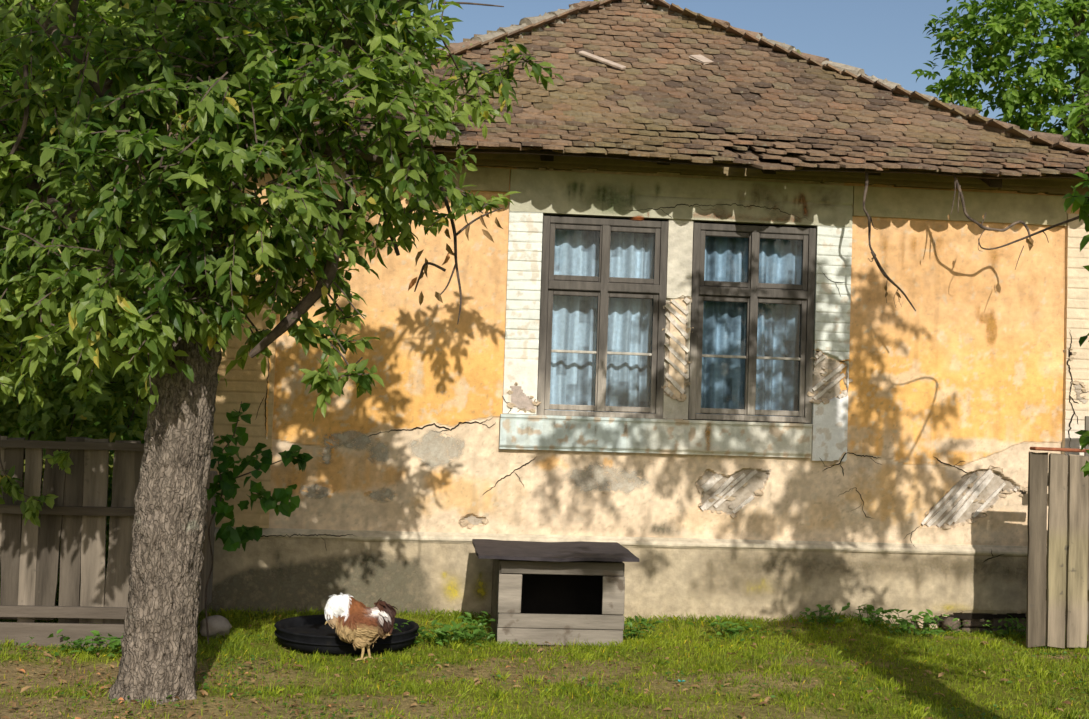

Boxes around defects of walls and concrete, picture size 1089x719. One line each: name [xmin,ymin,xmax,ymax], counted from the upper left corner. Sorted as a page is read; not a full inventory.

crack [623,203,813,223]
flaking render [662,295,694,402]
crack [354,396,511,442]
flaking render [506,382,541,413]
flaking render [807,351,853,404]
crack [482,455,537,496]
flaking render [696,468,770,518]
crack [933,455,970,473]
flaking render [921,465,1028,529]